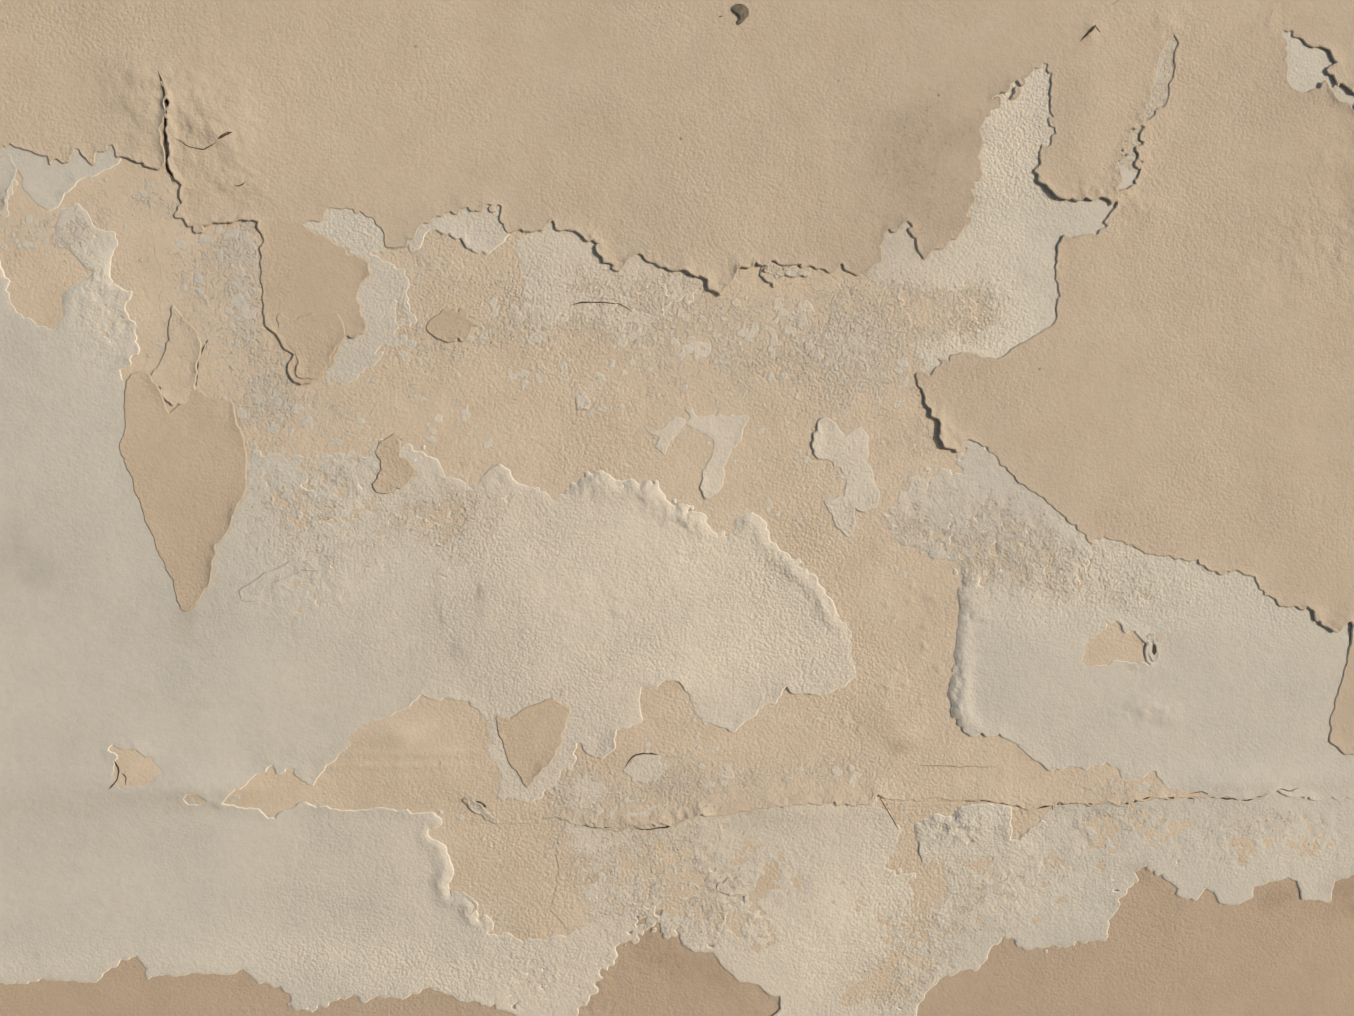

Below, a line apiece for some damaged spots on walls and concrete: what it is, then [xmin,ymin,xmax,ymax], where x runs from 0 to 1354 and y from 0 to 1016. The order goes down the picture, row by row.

peeling [1282,31,1354,110]
crack [158,72,232,181]
peeling [1116,125,1144,178]
peeling [1082,621,1149,667]
peeling [109,746,161,789]
peeling [550,829,599,934]
crack [583,823,669,831]
peeling [615,837,694,890]
peeling [914,801,1143,988]
peeling [1139,791,1354,905]
peeling [726,911,750,938]
peeling [839,948,932,1007]